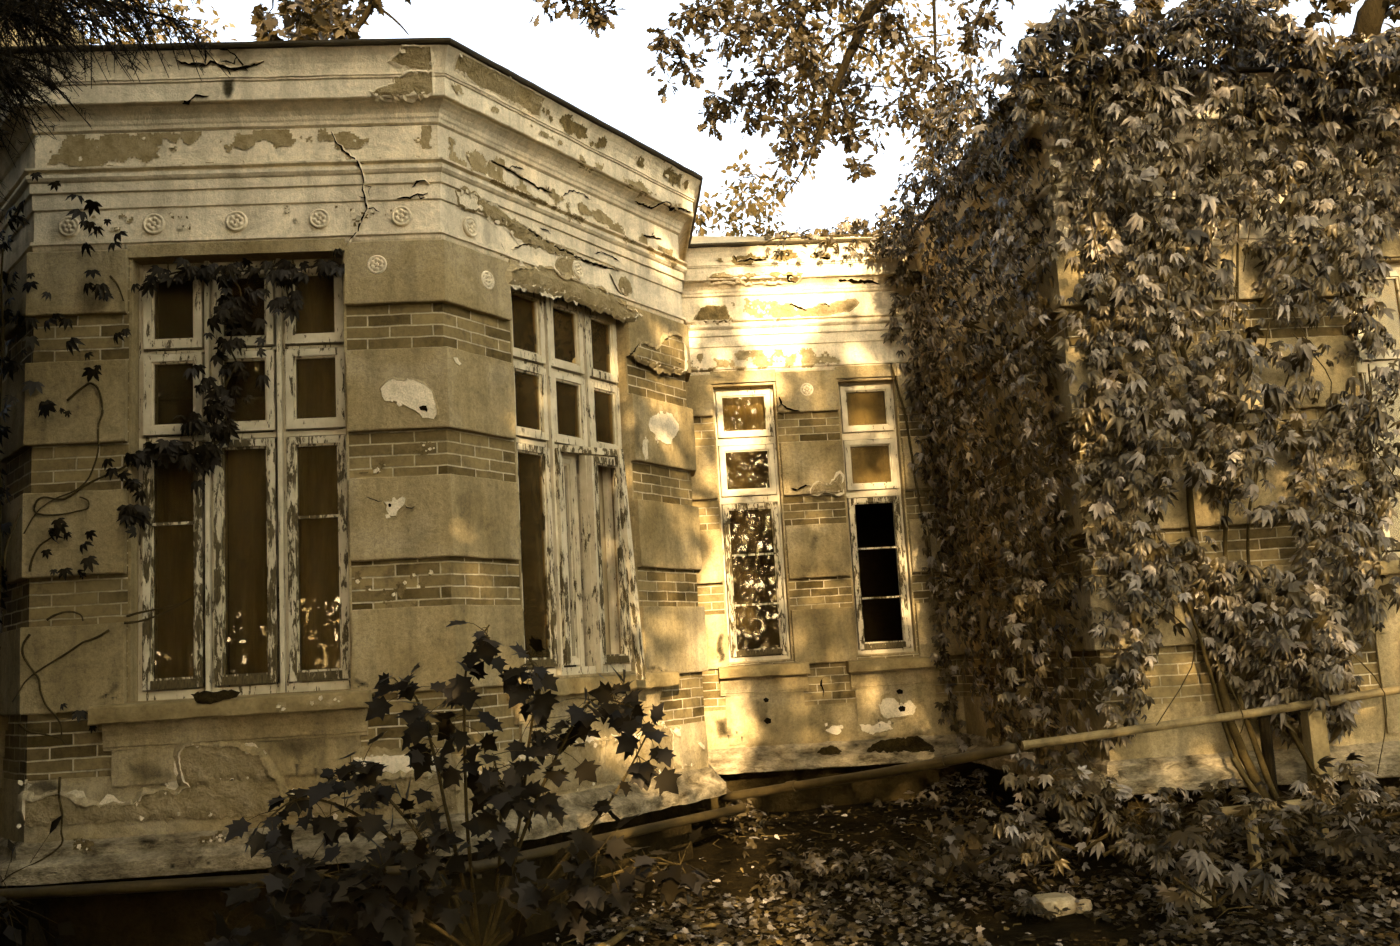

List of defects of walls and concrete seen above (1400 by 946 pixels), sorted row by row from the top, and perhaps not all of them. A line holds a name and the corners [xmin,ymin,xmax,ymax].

spalling [367,44,607,173]
peeling [47,131,202,168]
peeling [205,128,369,163]
crack [331,131,430,246]
spalling [413,125,860,375]
peeling [379,376,439,424]
peeling [640,405,682,462]
peeling [383,494,408,519]
peeling [825,693,918,736]